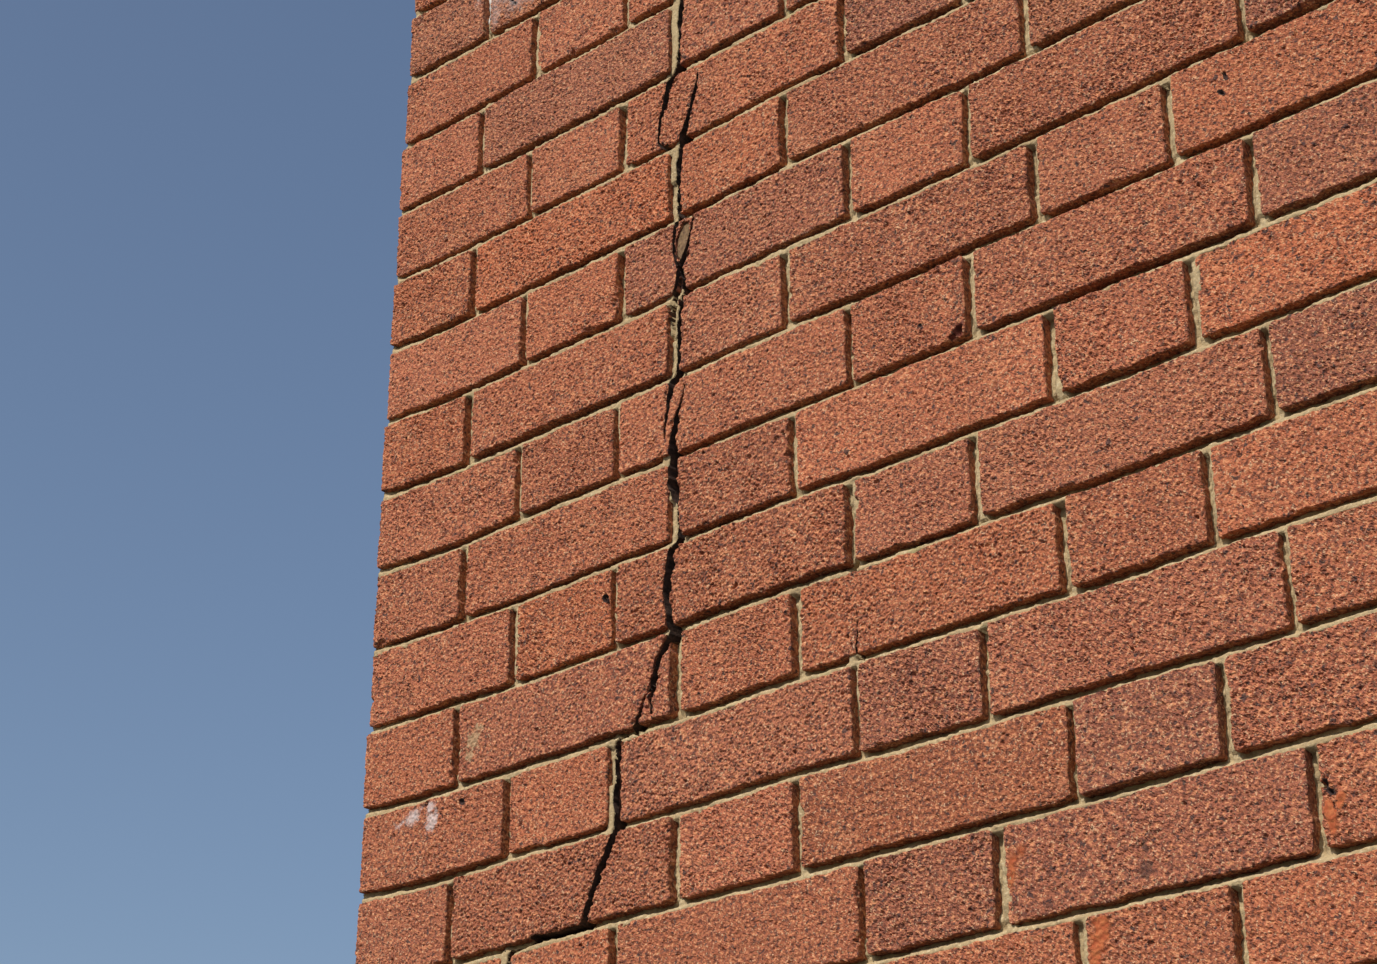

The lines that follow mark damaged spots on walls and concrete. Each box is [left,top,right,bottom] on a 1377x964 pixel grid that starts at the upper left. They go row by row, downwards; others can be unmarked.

crack [507,0,699,964]